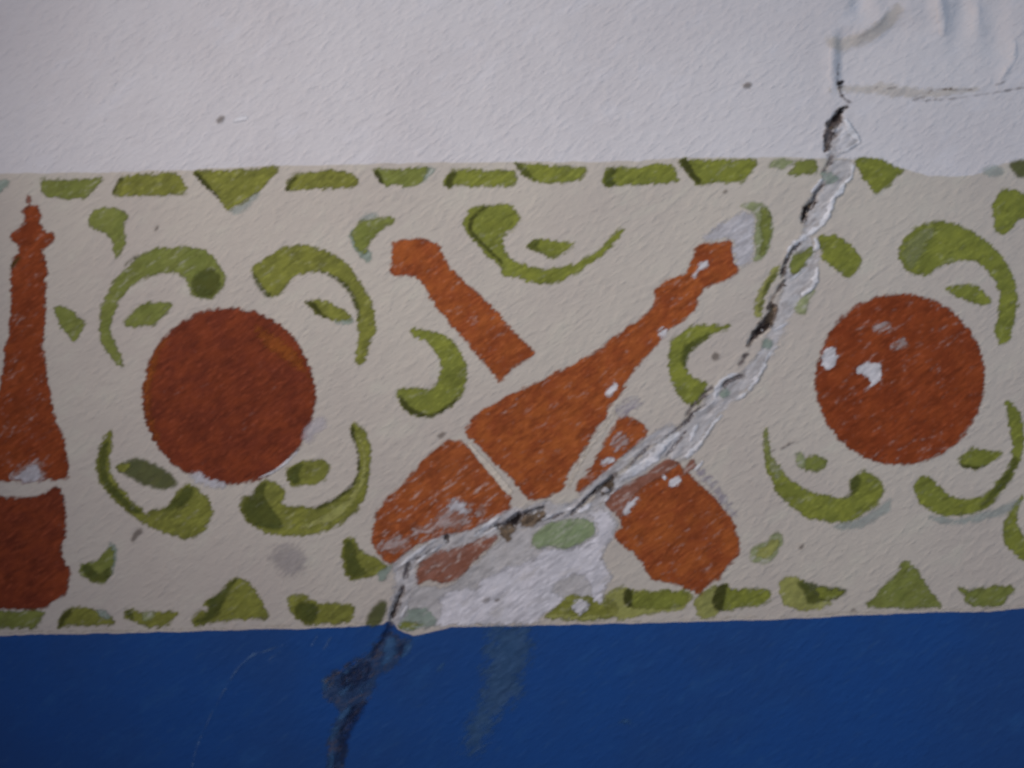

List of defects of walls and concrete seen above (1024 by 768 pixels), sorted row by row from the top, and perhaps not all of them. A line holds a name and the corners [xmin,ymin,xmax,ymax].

crack [387,67,861,625]
peeling [821,346,839,370]
peeling [856,361,882,387]
peeling [376,498,485,554]
spalling [402,497,639,627]